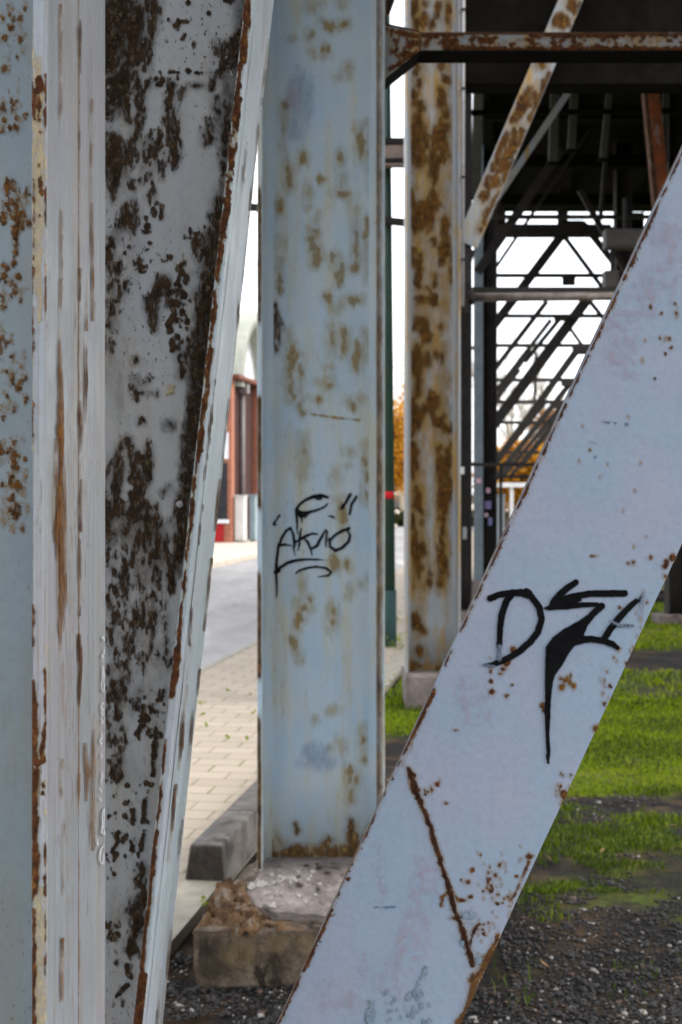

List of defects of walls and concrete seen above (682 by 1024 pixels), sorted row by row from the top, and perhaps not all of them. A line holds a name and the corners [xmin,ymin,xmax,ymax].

corrosion [0,4,47,133]
corrosion [208,0,261,349]
corrosion [0,146,47,533]
corrosion [257,0,682,881]
corrosion [181,716,193,757]
corrosion [133,739,183,1024]
corrosion [278,892,340,1024]
corrosion [440,854,533,907]